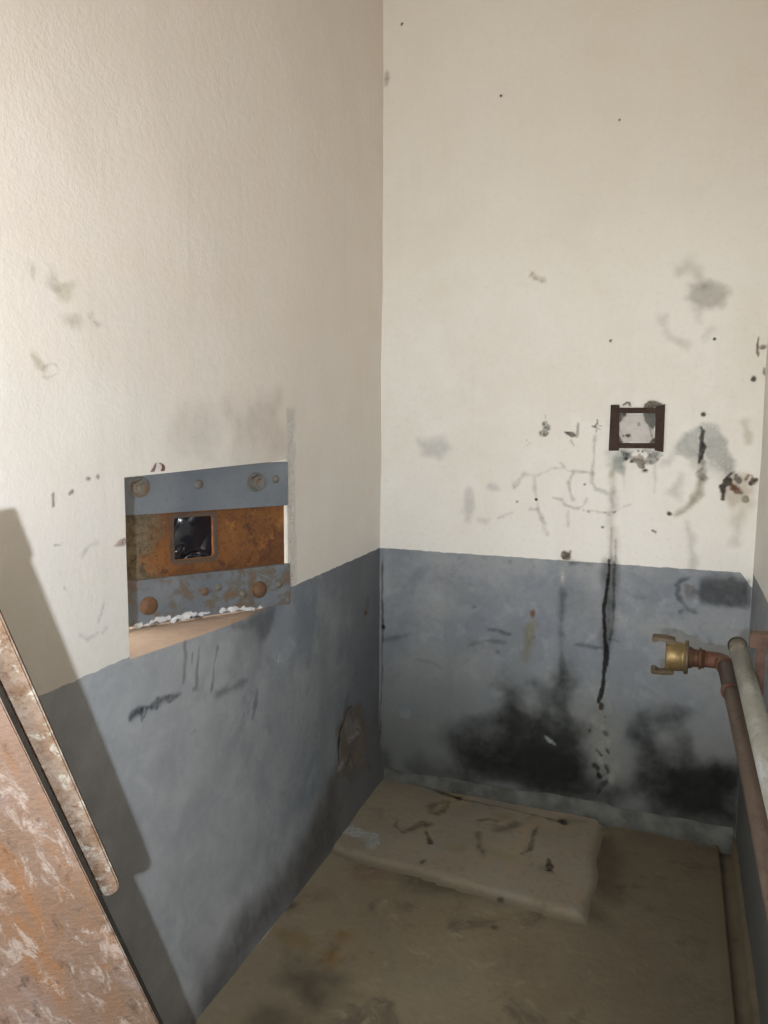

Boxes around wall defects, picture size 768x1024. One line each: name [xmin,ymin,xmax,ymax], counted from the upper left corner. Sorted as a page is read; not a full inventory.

crack [698,427,706,480]
crack [597,559,615,710]
damp [459,677,584,793]
damp [638,741,737,821]